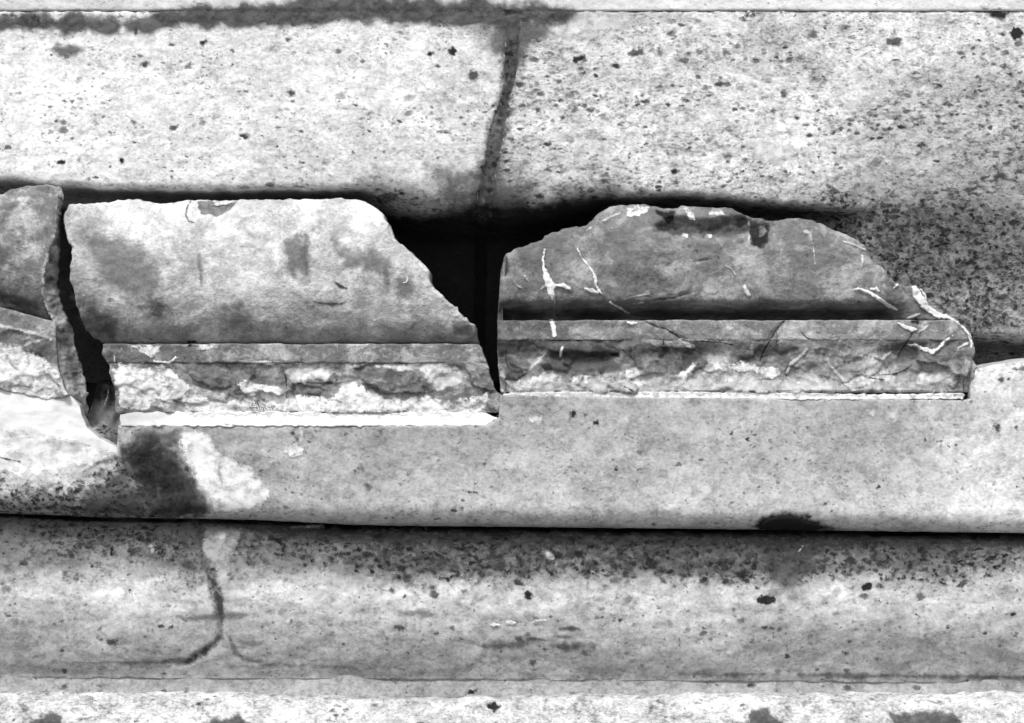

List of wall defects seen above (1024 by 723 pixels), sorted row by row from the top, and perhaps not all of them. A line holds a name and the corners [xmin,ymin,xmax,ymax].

water stain [0,0,576,220]
crack [505,293,733,381]
crack [757,319,813,380]
crack [855,332,913,389]
crack [100,568,223,664]